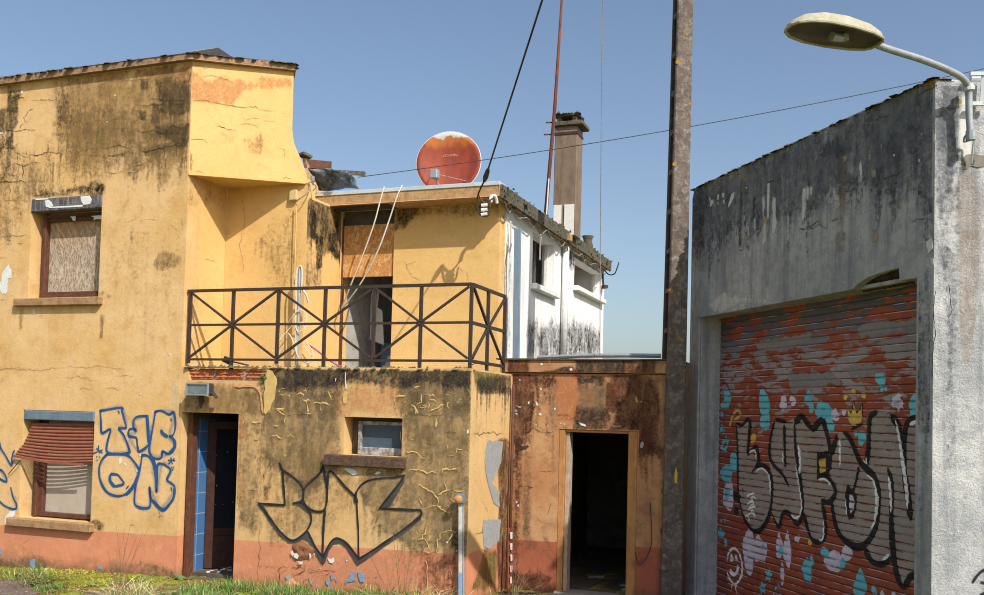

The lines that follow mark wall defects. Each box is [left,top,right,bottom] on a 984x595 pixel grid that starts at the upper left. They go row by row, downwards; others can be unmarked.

damp [0,85,53,241]
damp [56,65,192,182]
crack [0,64,276,273]
peeling [137,67,291,105]
damp [692,83,972,259]
peeling [0,265,13,295]
damp [310,213,340,270]
flaking render [189,368,277,415]
crack [241,388,334,492]
damp [172,338,662,595]
peeling [754,332,811,352]
peeling [788,362,886,394]